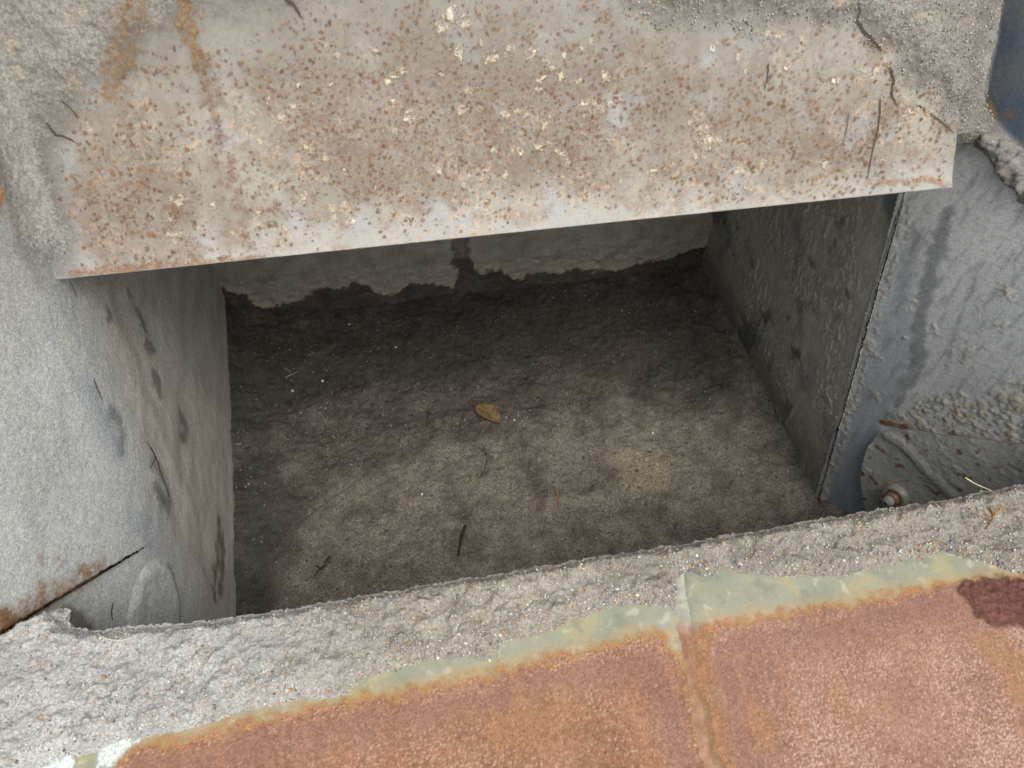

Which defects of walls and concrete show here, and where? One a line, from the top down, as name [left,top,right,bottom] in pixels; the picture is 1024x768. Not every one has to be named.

corrosion [176,0,217,104]
crack [856,2,953,180]
corrosion [68,260,211,275]
corrosion [0,564,100,634]
crack [0,545,147,635]
corrosion [115,573,1024,768]